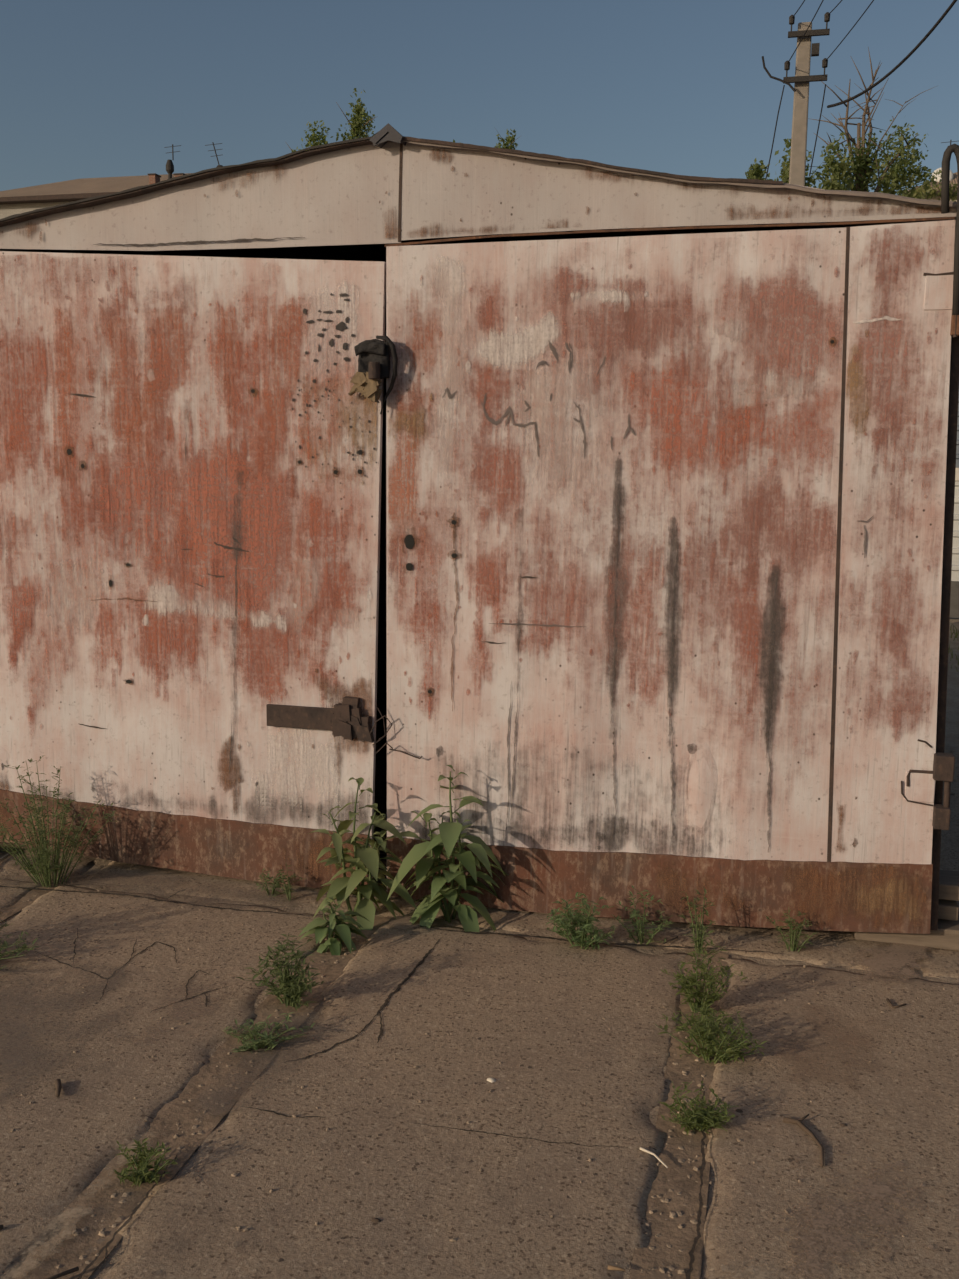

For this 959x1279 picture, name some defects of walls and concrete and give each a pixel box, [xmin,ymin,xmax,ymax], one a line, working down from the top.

corrosion [292,372,377,477]
leakage [606,460,627,704]
corrosion [212,737,241,810]
corrosion [315,668,372,768]
leakage [666,519,679,836]
leakage [760,568,785,852]
crack [0,928,225,1012]
crack [285,921,782,1062]
crack [78,1154,177,1279]
crack [686,1077,706,1279]